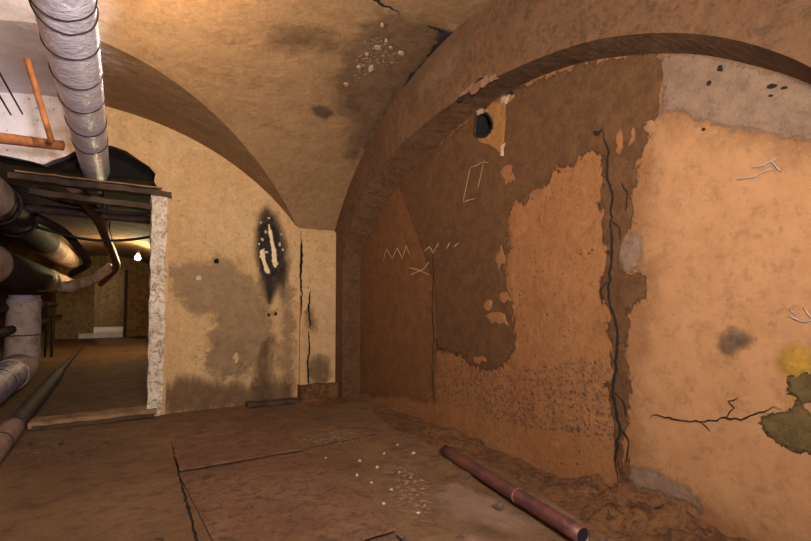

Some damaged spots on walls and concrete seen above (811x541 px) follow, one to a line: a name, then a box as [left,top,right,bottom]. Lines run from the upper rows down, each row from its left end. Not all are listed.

crack [374,0,400,15]
damp [165,260,296,414]
crack [299,239,311,384]
flaking render [360,54,811,541]
crack [593,129,629,481]
crack [650,397,782,431]
crack [173,452,198,541]